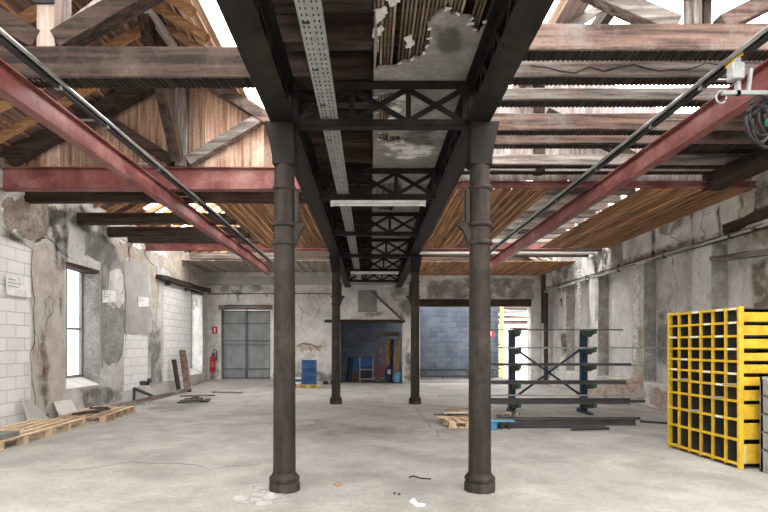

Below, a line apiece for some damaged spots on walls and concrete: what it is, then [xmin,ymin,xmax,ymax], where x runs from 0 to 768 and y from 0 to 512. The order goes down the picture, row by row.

peeling [372,0,494,66]
leakage [439,28,459,52]
crack [531,62,719,73]
leakage [384,130,434,159]
flaking render [1,196,56,243]
flaking render [113,238,206,326]
crack [29,229,70,405]
flaking render [103,305,124,366]